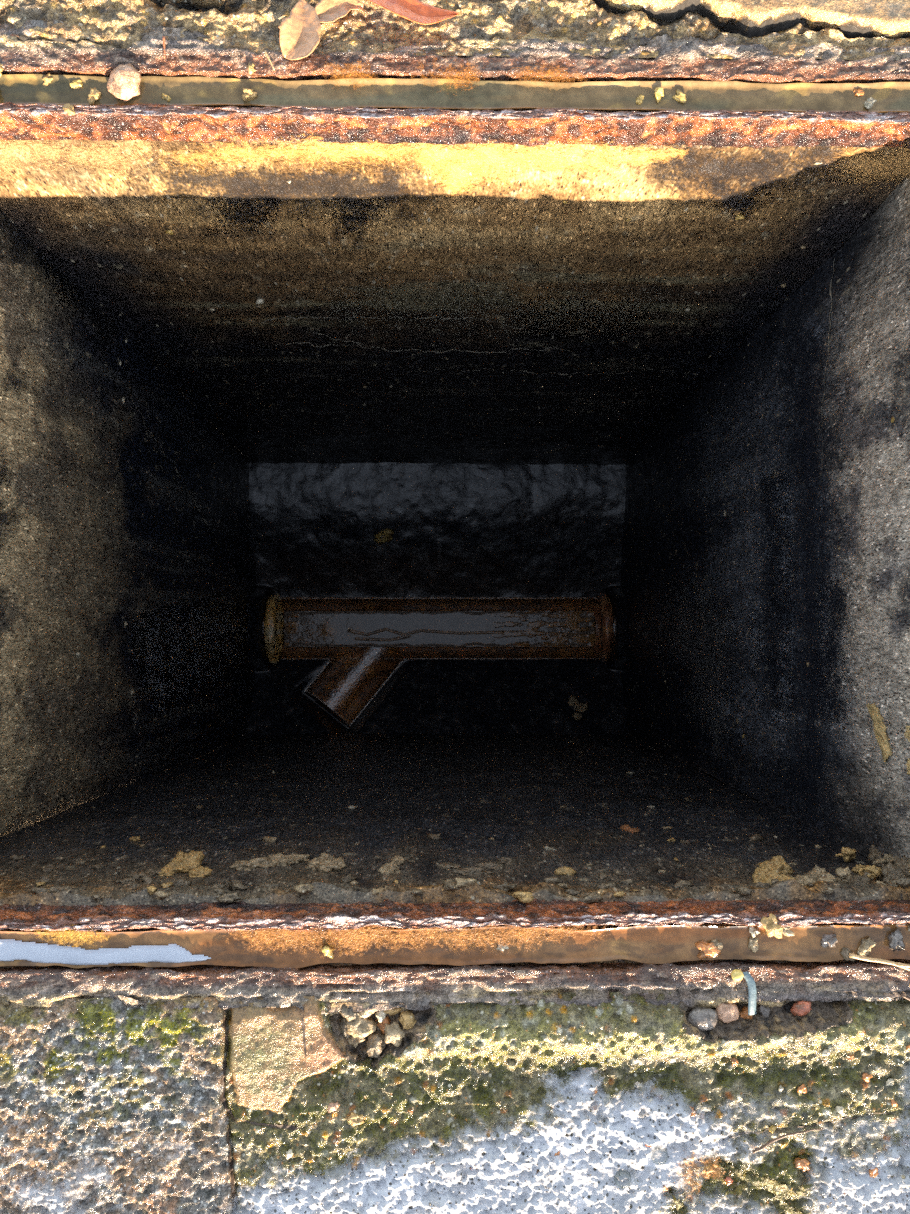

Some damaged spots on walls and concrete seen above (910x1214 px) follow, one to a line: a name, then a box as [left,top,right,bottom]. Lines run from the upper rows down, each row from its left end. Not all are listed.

crack [151,0,288,12]
crack [594,0,910,39]
corrosion [333,65,372,84]
corrosion [432,65,479,88]
corrosion [517,68,583,81]
leakage [635,127,845,216]
leakage [130,141,442,249]
leakage [0,209,120,347]
corrosion [37,925,107,946]
corrosion [229,925,600,955]